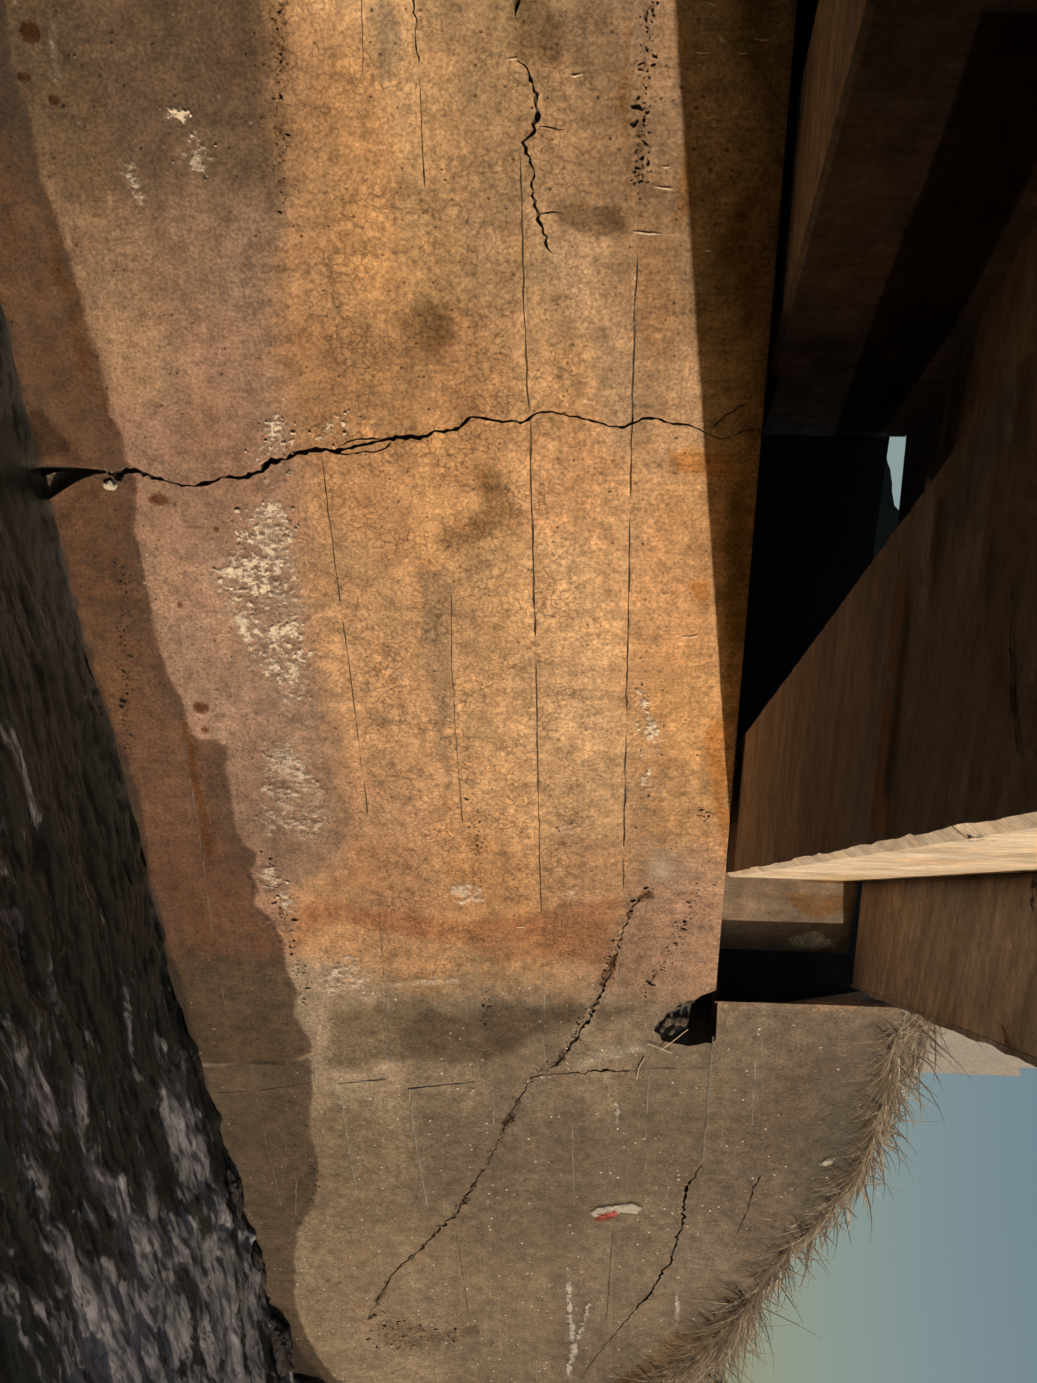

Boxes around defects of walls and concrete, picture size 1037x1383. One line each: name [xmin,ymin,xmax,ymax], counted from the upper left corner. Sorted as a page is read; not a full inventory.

crack [513,0,521,16]
crack [517,56,566,254]
crack [107,404,757,487]
leakage [70,468,183,730]
leakage [210,498,315,716]
leakage [247,737,324,836]
leakage [148,814,295,1020]
crack [369,883,663,1318]
spalling [654,982,718,1046]
crack [586,1165,703,1370]